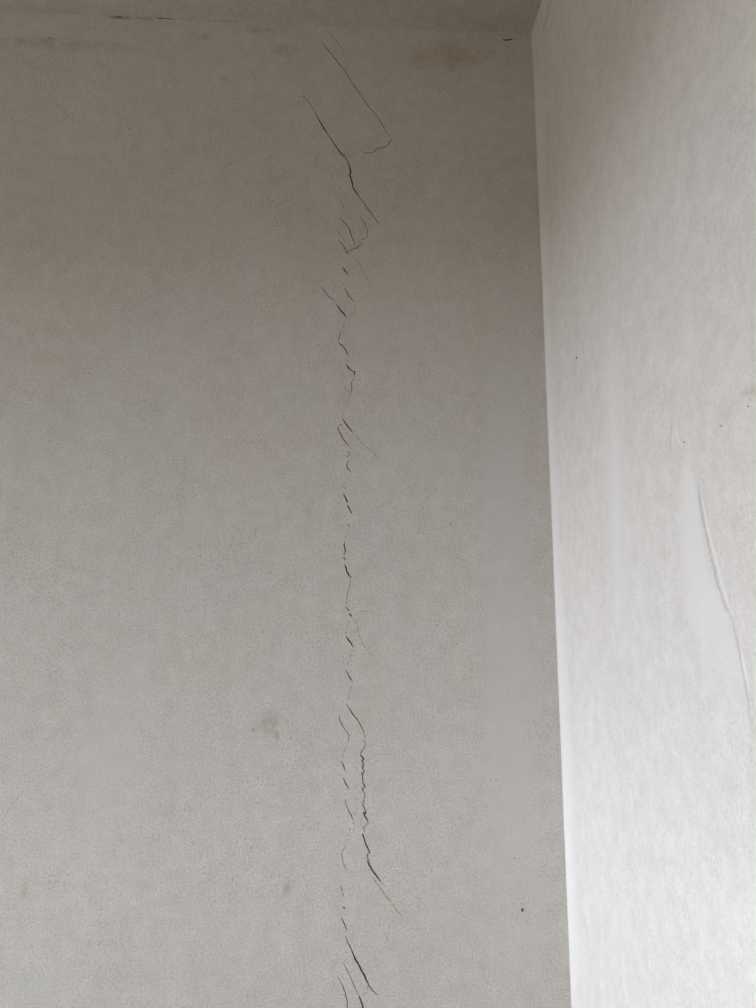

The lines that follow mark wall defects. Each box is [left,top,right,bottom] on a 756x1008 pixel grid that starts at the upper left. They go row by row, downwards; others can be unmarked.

crack [302,32,402,1008]